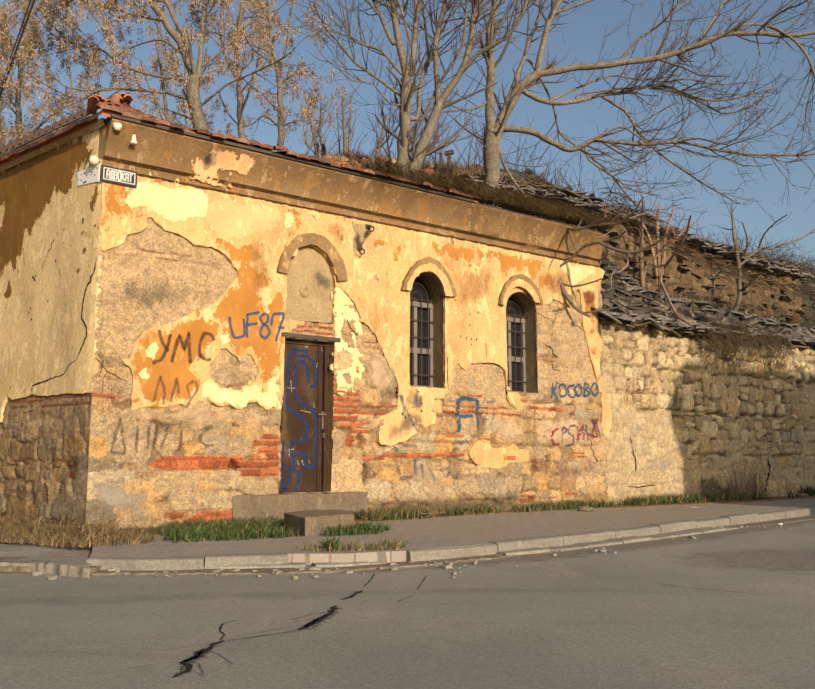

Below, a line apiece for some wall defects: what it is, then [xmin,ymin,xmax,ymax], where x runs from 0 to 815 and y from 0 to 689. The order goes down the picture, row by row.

peeling [0,136,93,298]
crack [0,258,122,435]
flaking render [90,149,302,409]
flaking render [329,287,414,426]
flaking render [432,242,596,406]